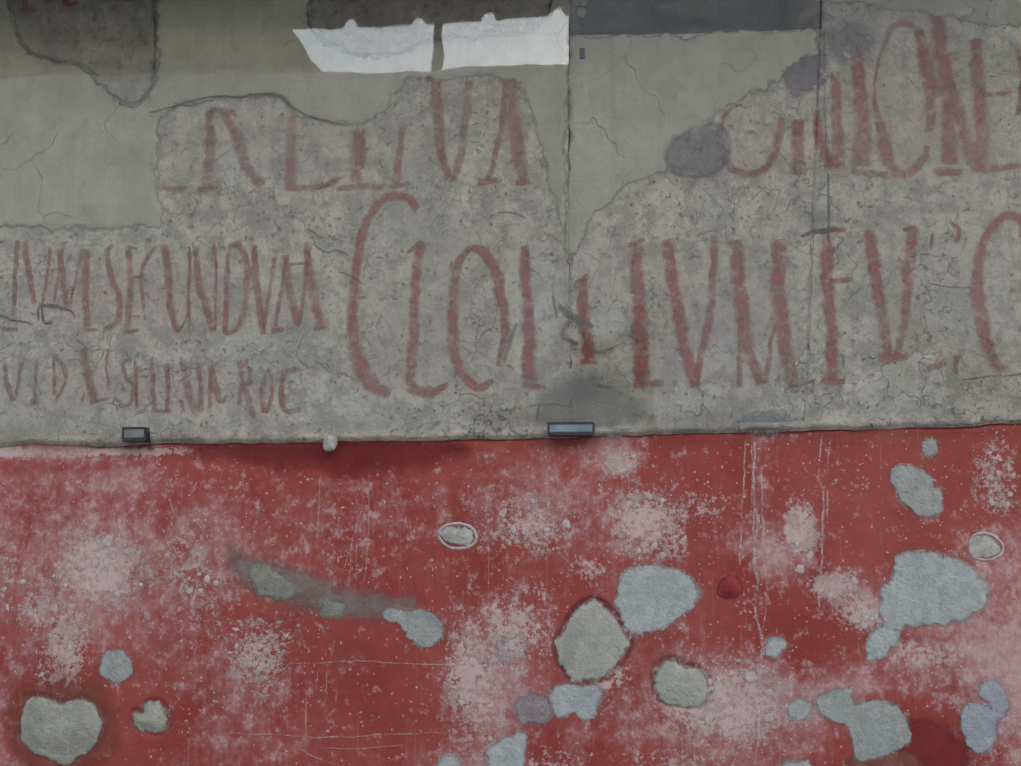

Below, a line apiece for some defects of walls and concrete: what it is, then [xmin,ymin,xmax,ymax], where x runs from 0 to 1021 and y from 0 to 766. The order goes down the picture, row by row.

spalling [7,0,160,107]
spalling [306,0,552,59]
damp [514,692,553,726]